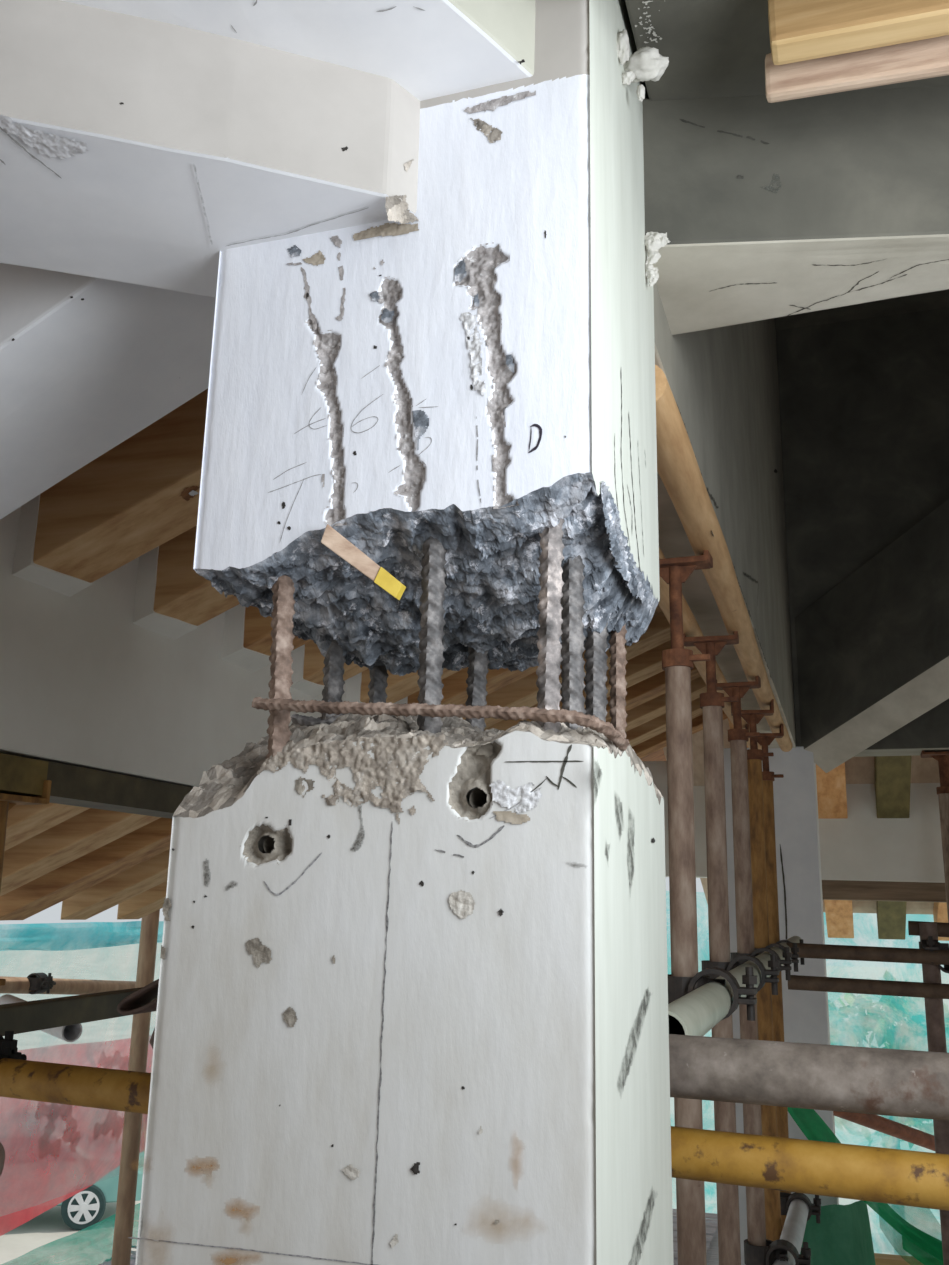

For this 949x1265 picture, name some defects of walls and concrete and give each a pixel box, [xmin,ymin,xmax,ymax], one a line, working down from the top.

peeling [287,245,325,266]
spalling [330,195,419,248]
crack [709,259,949,318]
crack [474,417,482,502]
spalling [195,472,659,676]
spalling [173,713,663,824]
peeling [615,797,634,885]